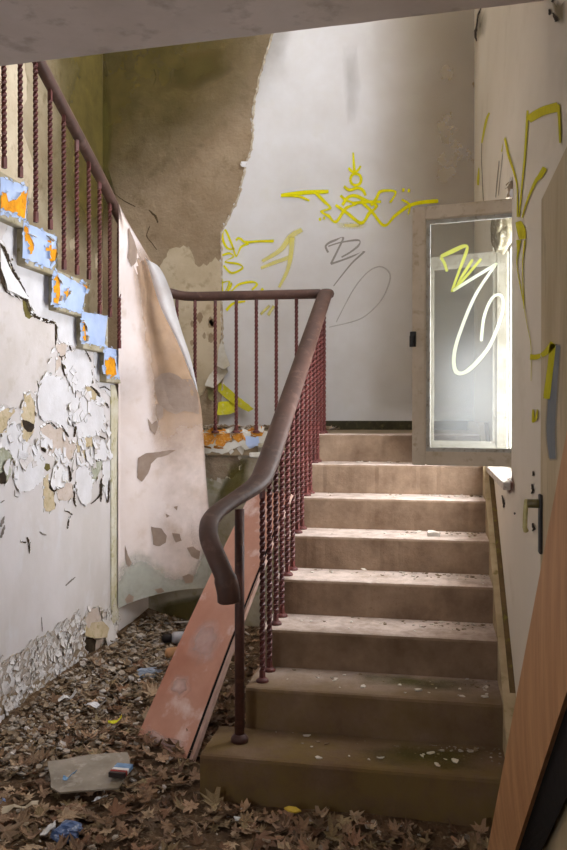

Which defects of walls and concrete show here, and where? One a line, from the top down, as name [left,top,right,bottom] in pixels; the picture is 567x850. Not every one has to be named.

peeling [0,33,274,723]